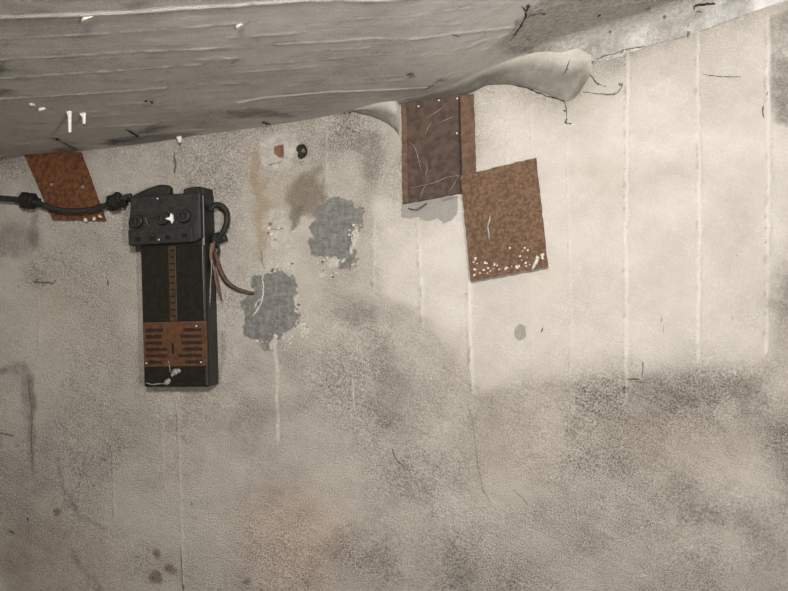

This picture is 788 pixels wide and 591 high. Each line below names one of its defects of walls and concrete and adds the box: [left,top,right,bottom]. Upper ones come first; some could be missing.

crack [510,4,543,41]
crack [582,46,646,95]
crack [515,85,571,124]
peeling [308,197,365,278]
peeling [240,251,310,351]
leakage [515,325,526,340]